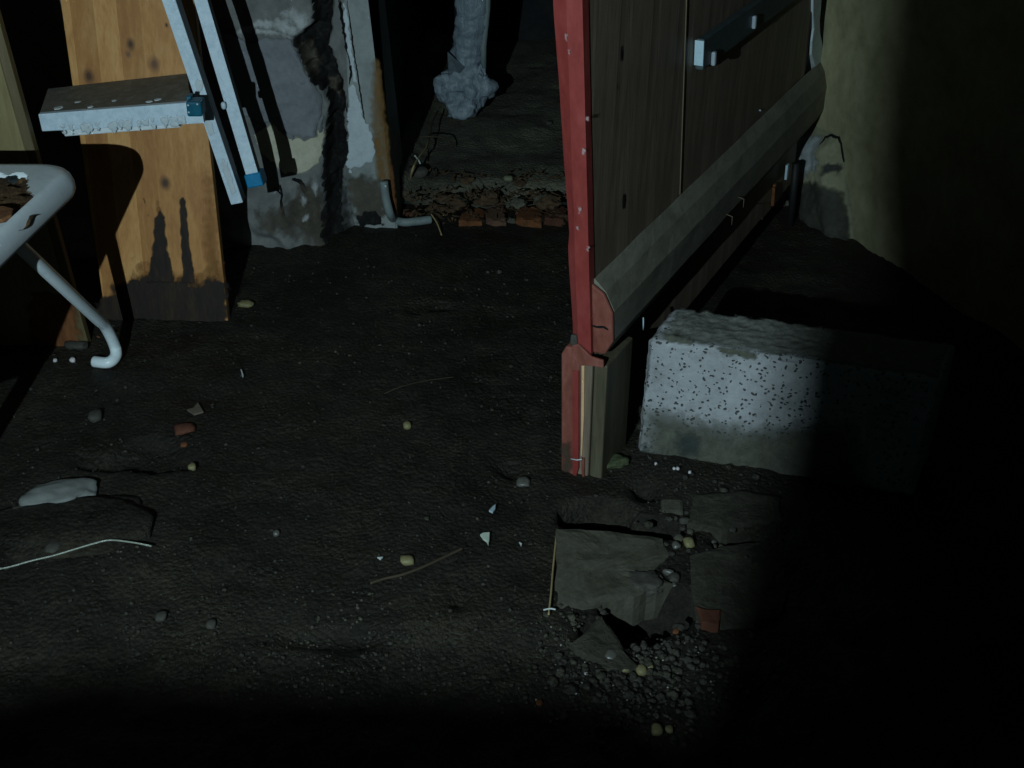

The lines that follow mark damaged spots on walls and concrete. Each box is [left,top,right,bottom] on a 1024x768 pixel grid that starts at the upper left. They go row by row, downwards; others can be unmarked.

flaking render [220,0,375,245]
spalling [356,211,384,227]